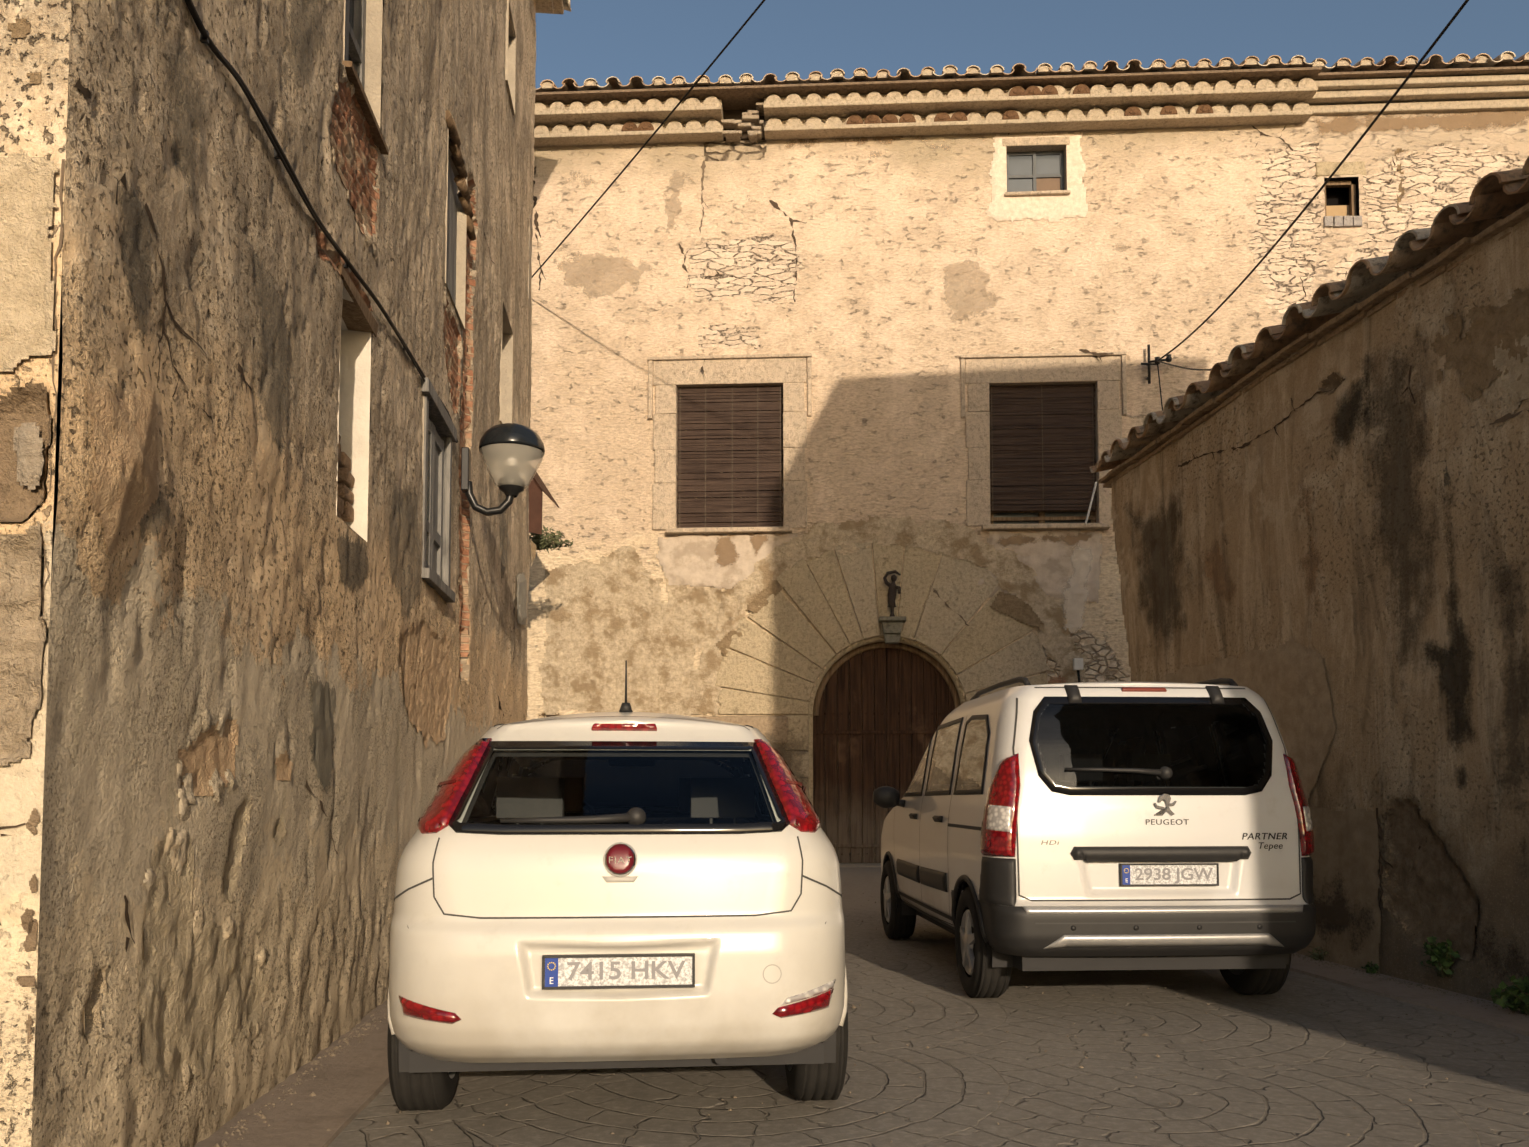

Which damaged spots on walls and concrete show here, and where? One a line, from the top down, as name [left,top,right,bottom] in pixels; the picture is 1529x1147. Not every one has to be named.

spalling [0,149,58,522]
spalling [330,60,380,262]
spalling [443,167,478,684]
crack [678,160,804,302]
spalling [685,233,802,304]
crack [1178,379,1345,467]
spalling [1431,288,1529,401]
water stain [1126,502,1186,638]
water stain [1332,356,1475,747]
water stain [1499,567,1529,789]
peeling [138,707,268,1095]